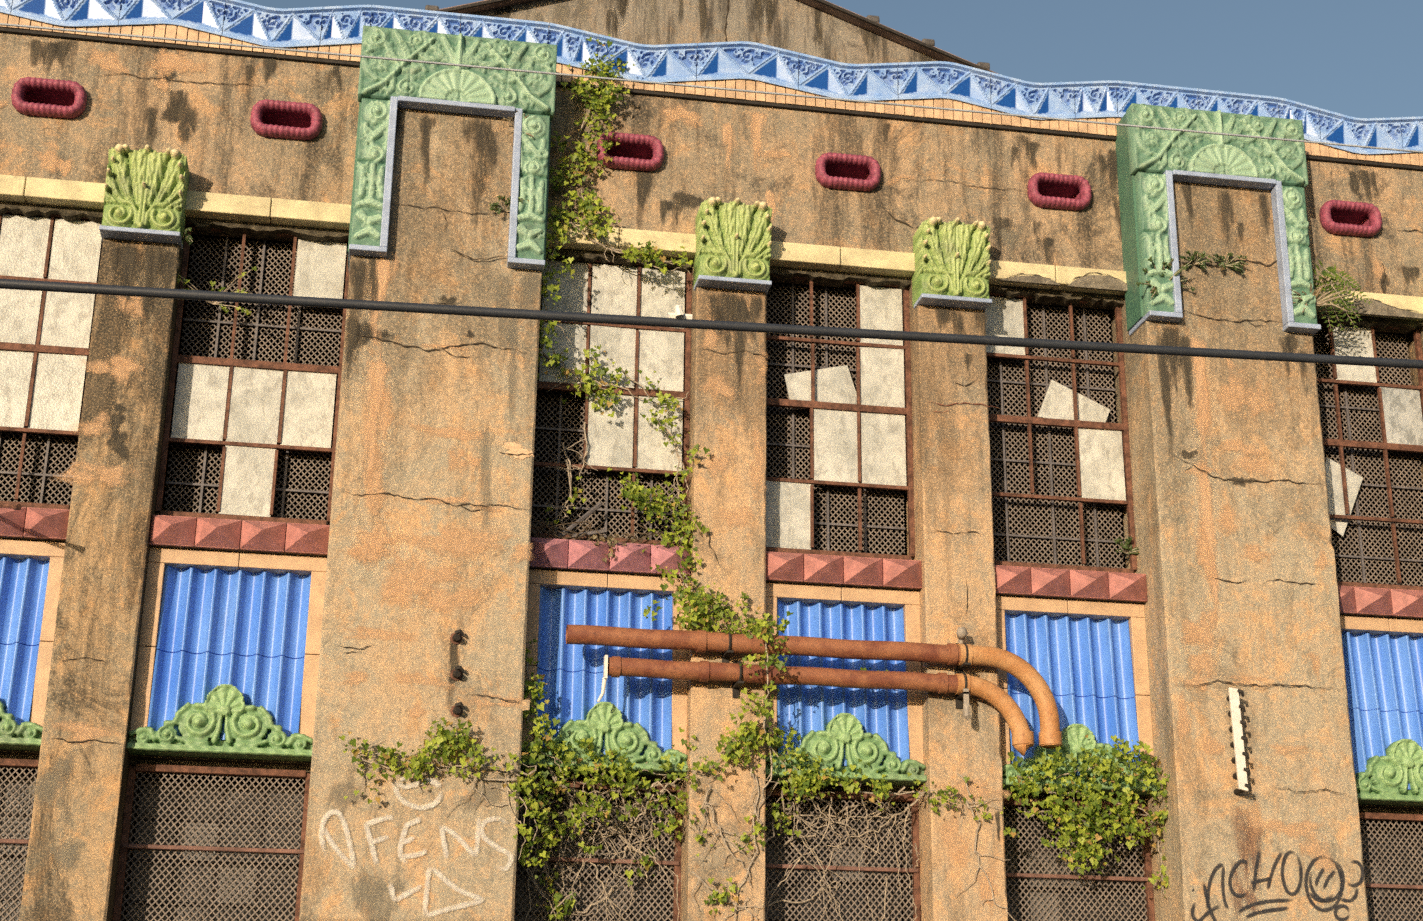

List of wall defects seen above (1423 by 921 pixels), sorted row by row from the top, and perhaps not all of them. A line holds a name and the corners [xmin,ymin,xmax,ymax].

water stain [497,6,511,18]
water stain [606,0,627,35]
water stain [679,0,706,33]
water stain [751,0,774,43]
water stain [814,8,822,48]
crack [354,331,523,358]
crack [1174,450,1327,486]
crack [339,491,533,512]